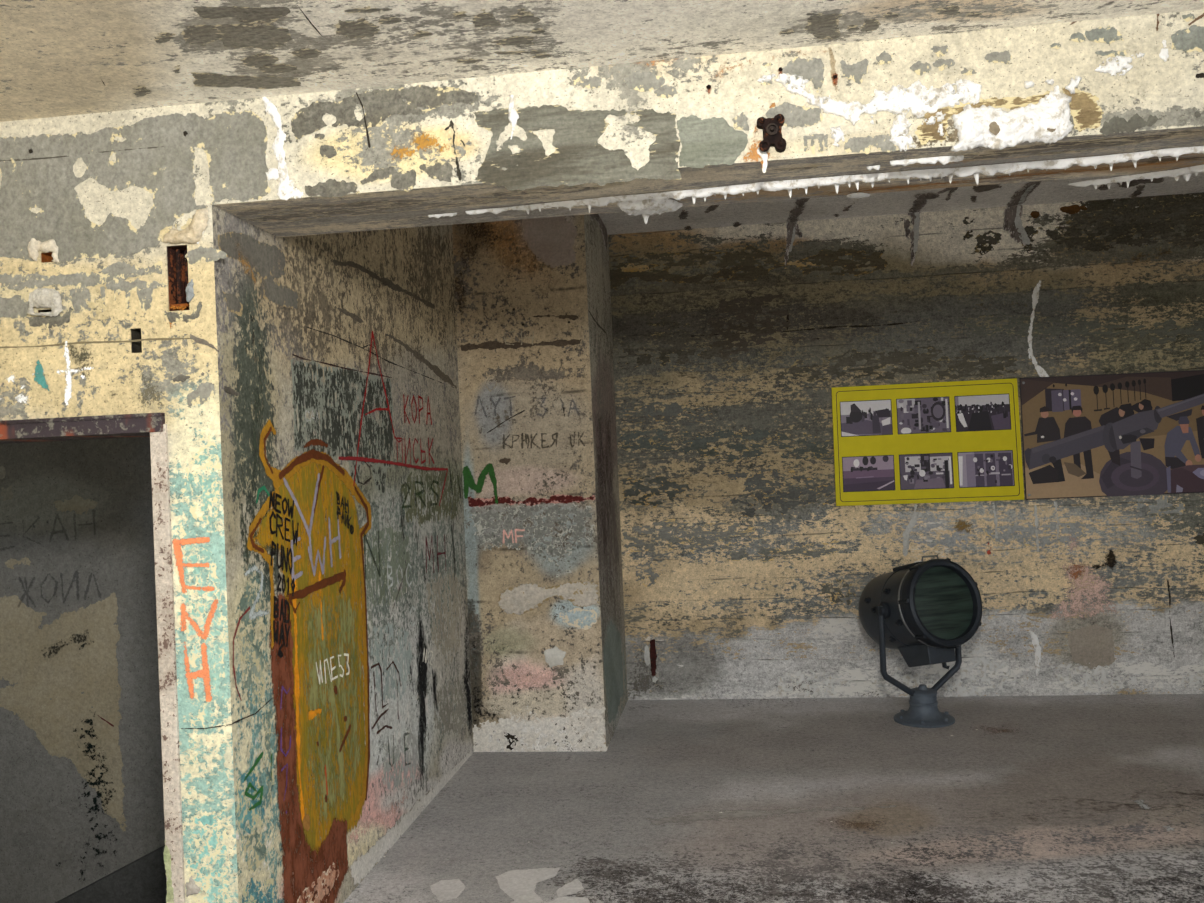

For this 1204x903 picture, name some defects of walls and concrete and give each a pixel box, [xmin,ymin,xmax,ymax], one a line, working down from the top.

peeling [154,6,321,89]
peeling [335,6,402,39]
peeling [779,12,899,40]
peeling [1050,25,1127,57]
peeling [0,70,749,352]
peeling [765,102,828,171]
damp [428,40,1204,325]
peeling [915,87,1204,160]
efflorescence [1028,280,1049,377]
peeling [619,402,845,587]
peeling [0,593,127,832]
peeling [163,425,275,903]